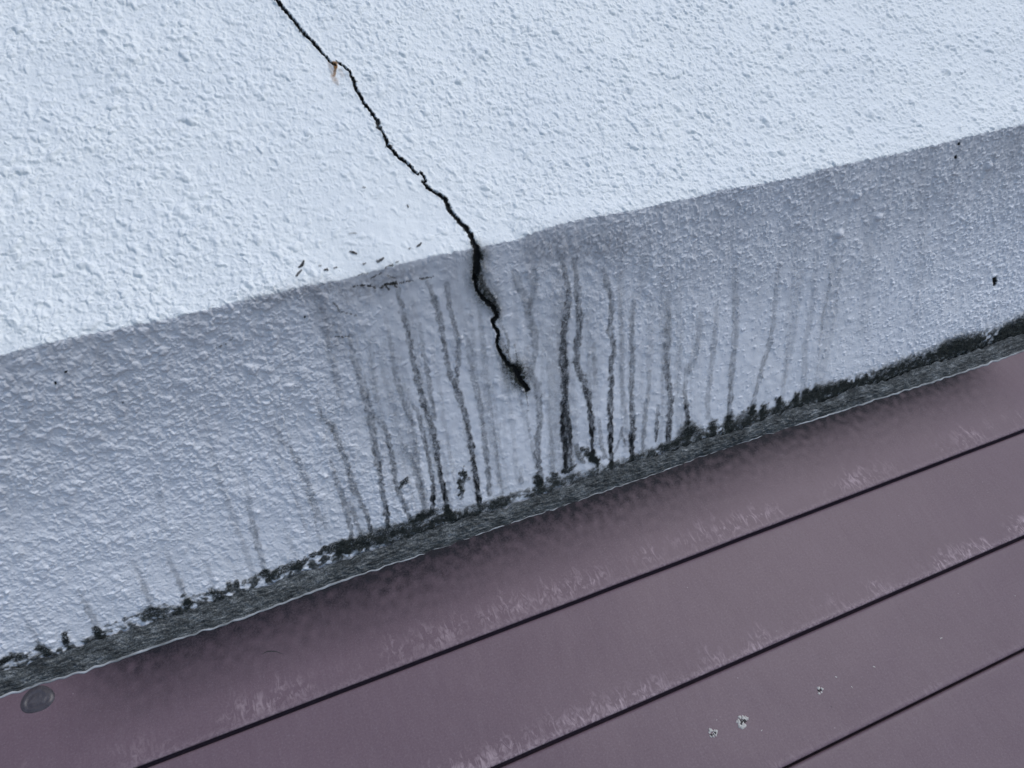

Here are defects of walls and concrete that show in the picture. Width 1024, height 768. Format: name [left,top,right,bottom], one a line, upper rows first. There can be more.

crack [274,0,530,392]
leakage [0,290,1024,671]